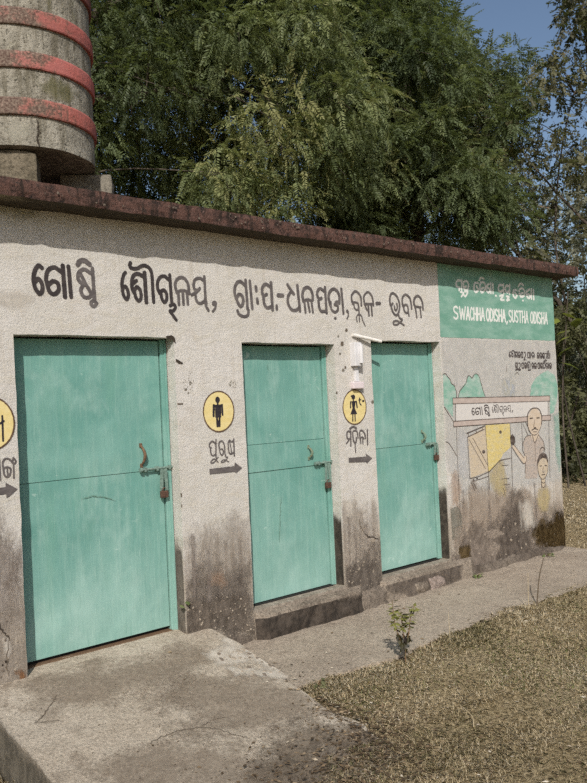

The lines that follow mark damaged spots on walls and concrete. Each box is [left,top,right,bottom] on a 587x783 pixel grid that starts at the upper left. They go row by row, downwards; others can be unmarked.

damp [175,485,563,640]
damp [0,727,49,783]
crack [146,717,247,746]